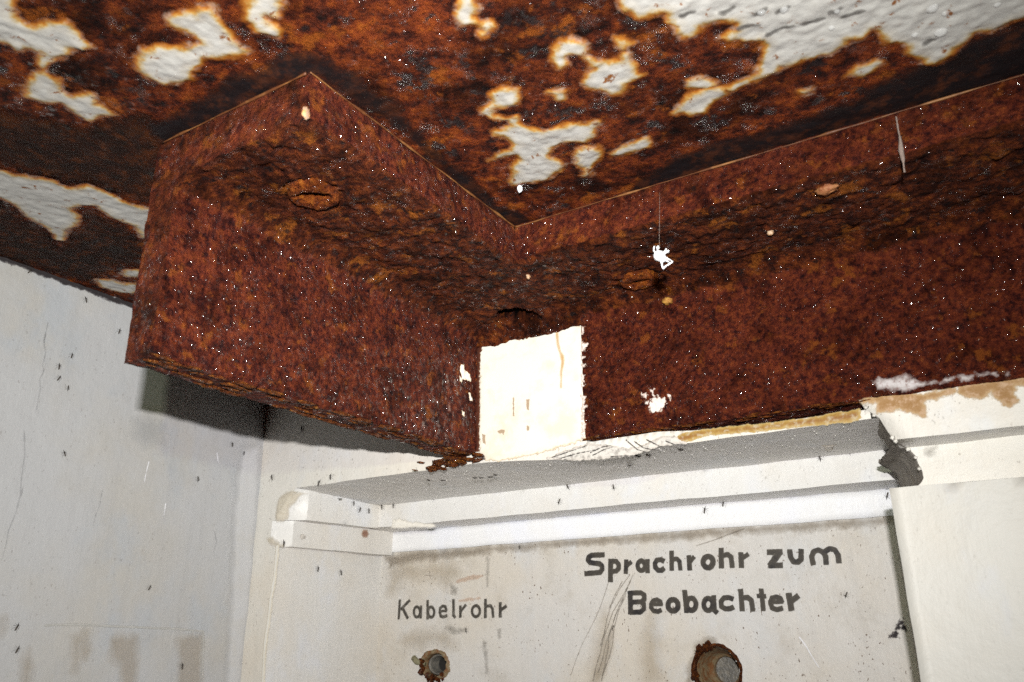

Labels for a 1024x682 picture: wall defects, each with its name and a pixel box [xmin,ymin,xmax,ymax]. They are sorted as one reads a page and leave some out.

peeling [0,0,120,123]
peeling [132,0,288,86]
peeling [452,0,499,41]
peeling [543,33,648,102]
peeling [615,0,1024,117]
peeling [478,84,654,187]
peeling [0,169,149,241]
rust [815,183,839,196]
rust [412,347,485,473]
peeling [479,326,923,487]
leakage [874,372,1008,391]
rust [862,378,1024,418]